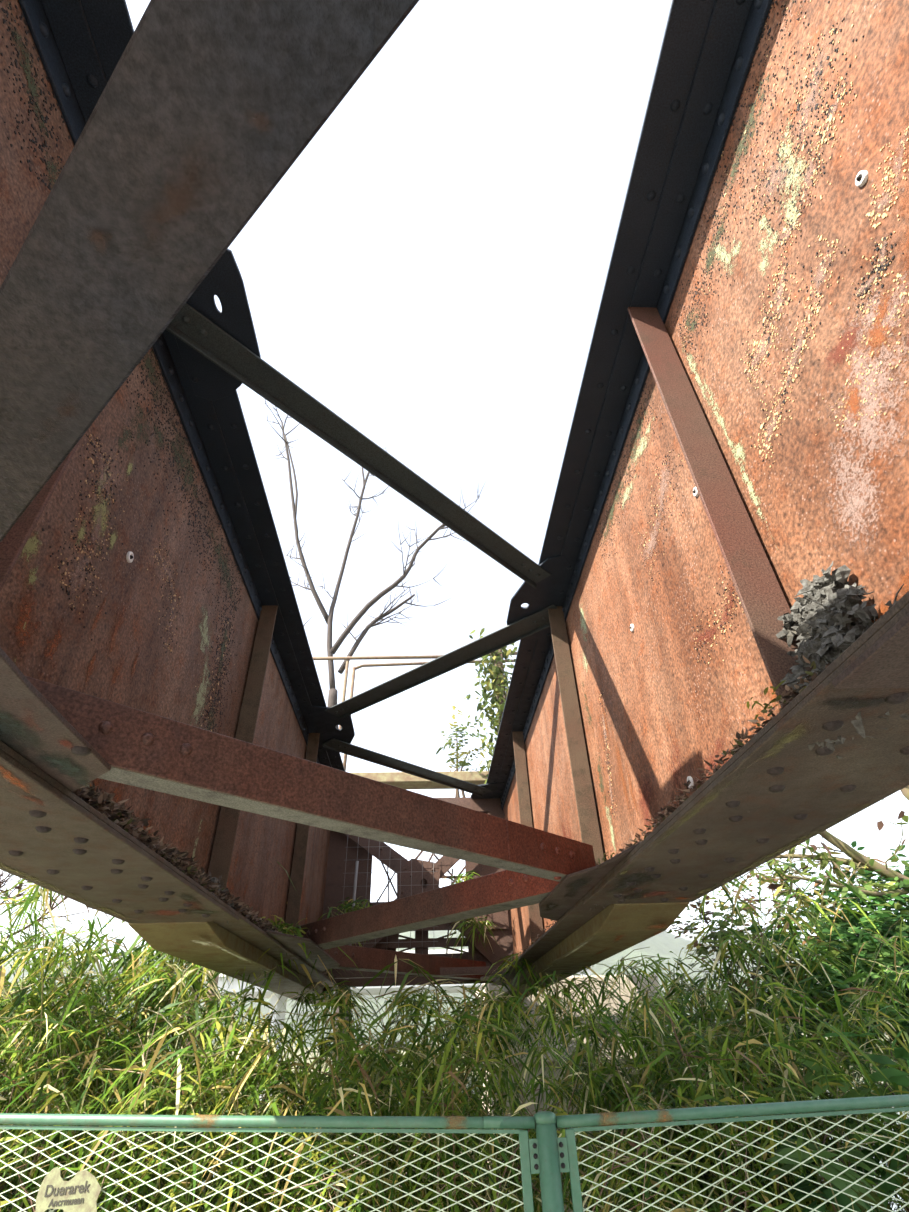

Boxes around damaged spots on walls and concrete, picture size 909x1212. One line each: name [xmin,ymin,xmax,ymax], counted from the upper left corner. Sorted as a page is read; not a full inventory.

corrosion [827,205,909,542]
corrosion [871,568,909,623]
corrosion [753,681,777,727]
corrosion [615,748,653,831]